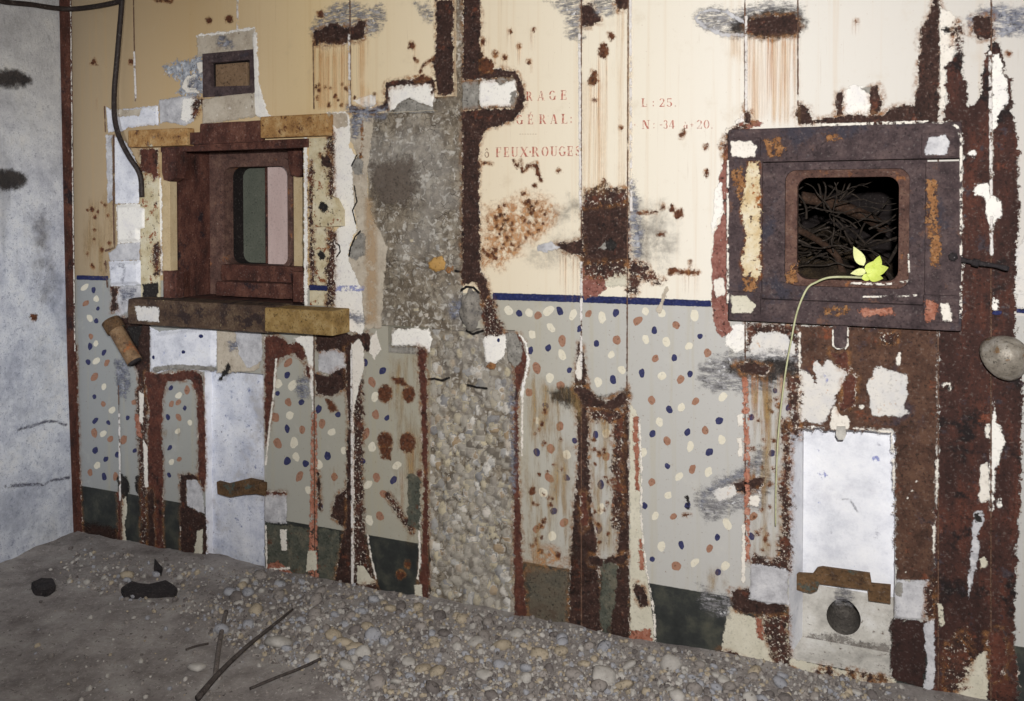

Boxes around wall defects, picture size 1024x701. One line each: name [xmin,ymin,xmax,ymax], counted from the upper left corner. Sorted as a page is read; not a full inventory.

rust [114,316,207,549]
spalling [327,0,518,612]
rust [312,0,763,638]
peeling [720,376,896,683]
rust [732,0,1024,701]